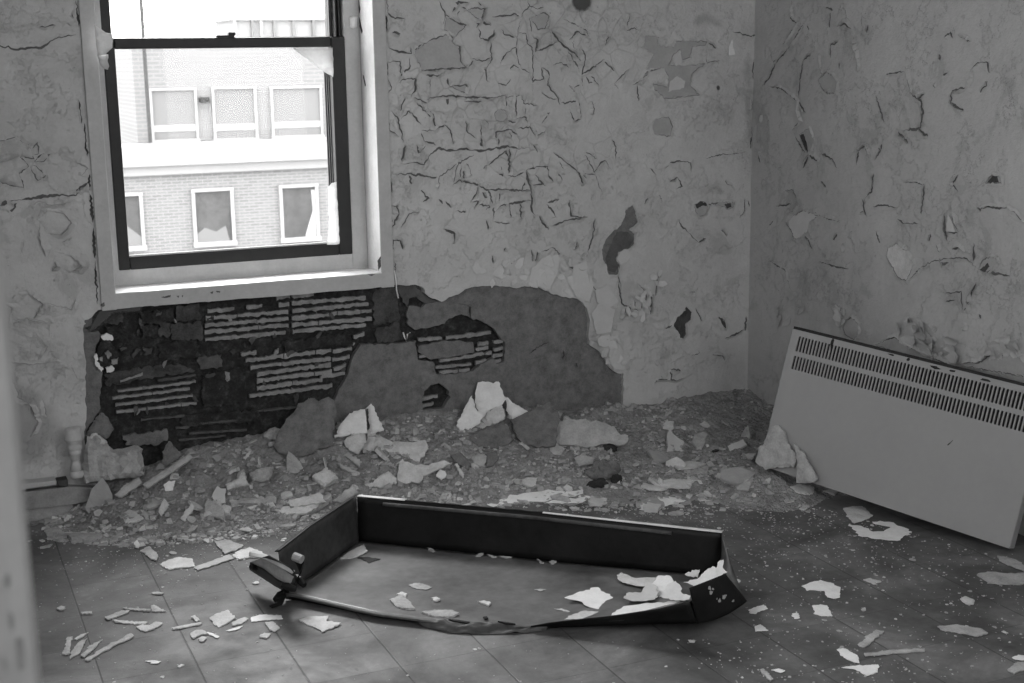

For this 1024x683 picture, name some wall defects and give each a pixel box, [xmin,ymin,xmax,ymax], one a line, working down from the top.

crack [0,0,80,51]
peeling [641,35,710,140]
crack [359,0,673,350]
crack [645,0,1024,331]
crack [0,100,100,437]
spalling [83,204,667,468]
flaking render [671,306,694,342]
crack [654,316,749,384]
peeling [896,318,1024,381]